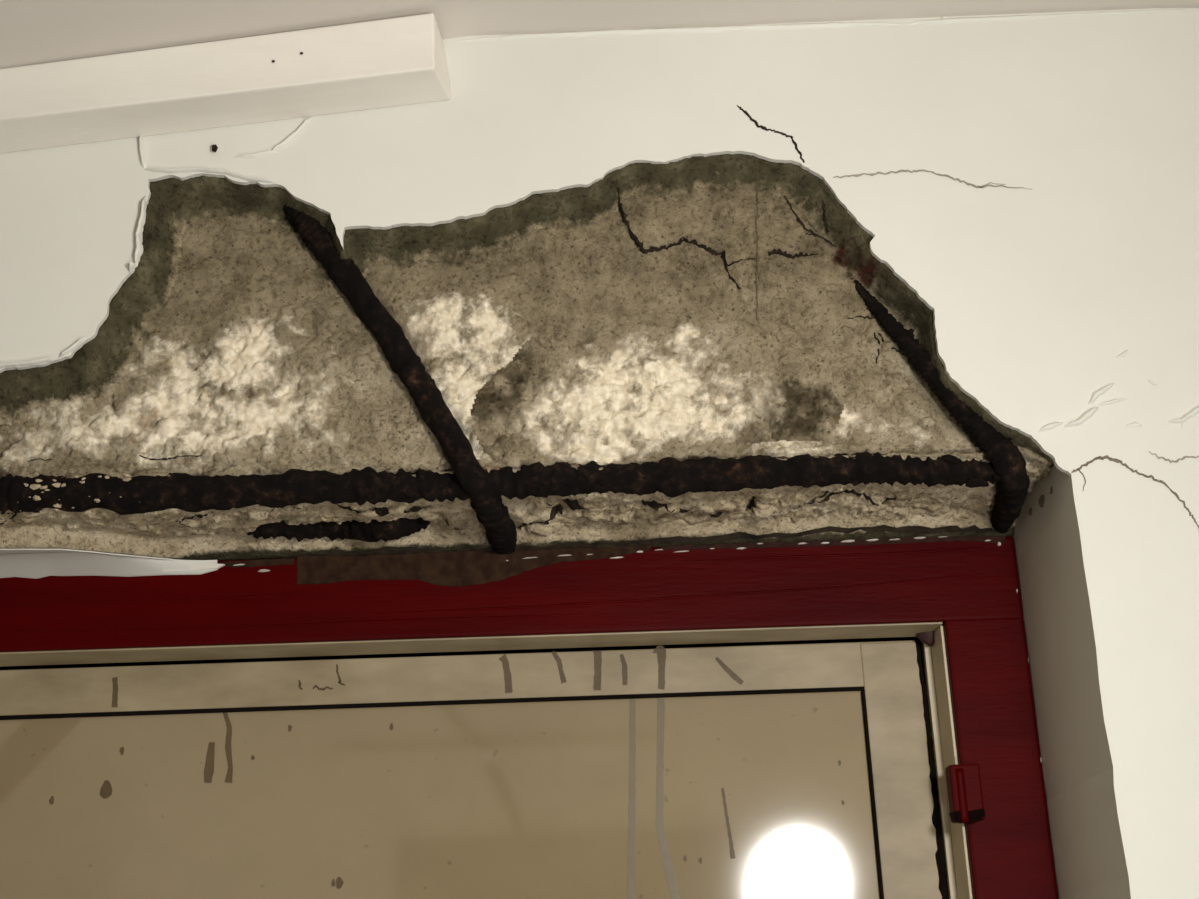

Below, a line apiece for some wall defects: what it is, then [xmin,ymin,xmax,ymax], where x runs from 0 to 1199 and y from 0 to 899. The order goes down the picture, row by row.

crack [737,105,805,163]
crack [618,165,1026,320]
corrosion [832,238,883,288]
spalling [0,154,1054,579]
crack [1071,451,1199,528]